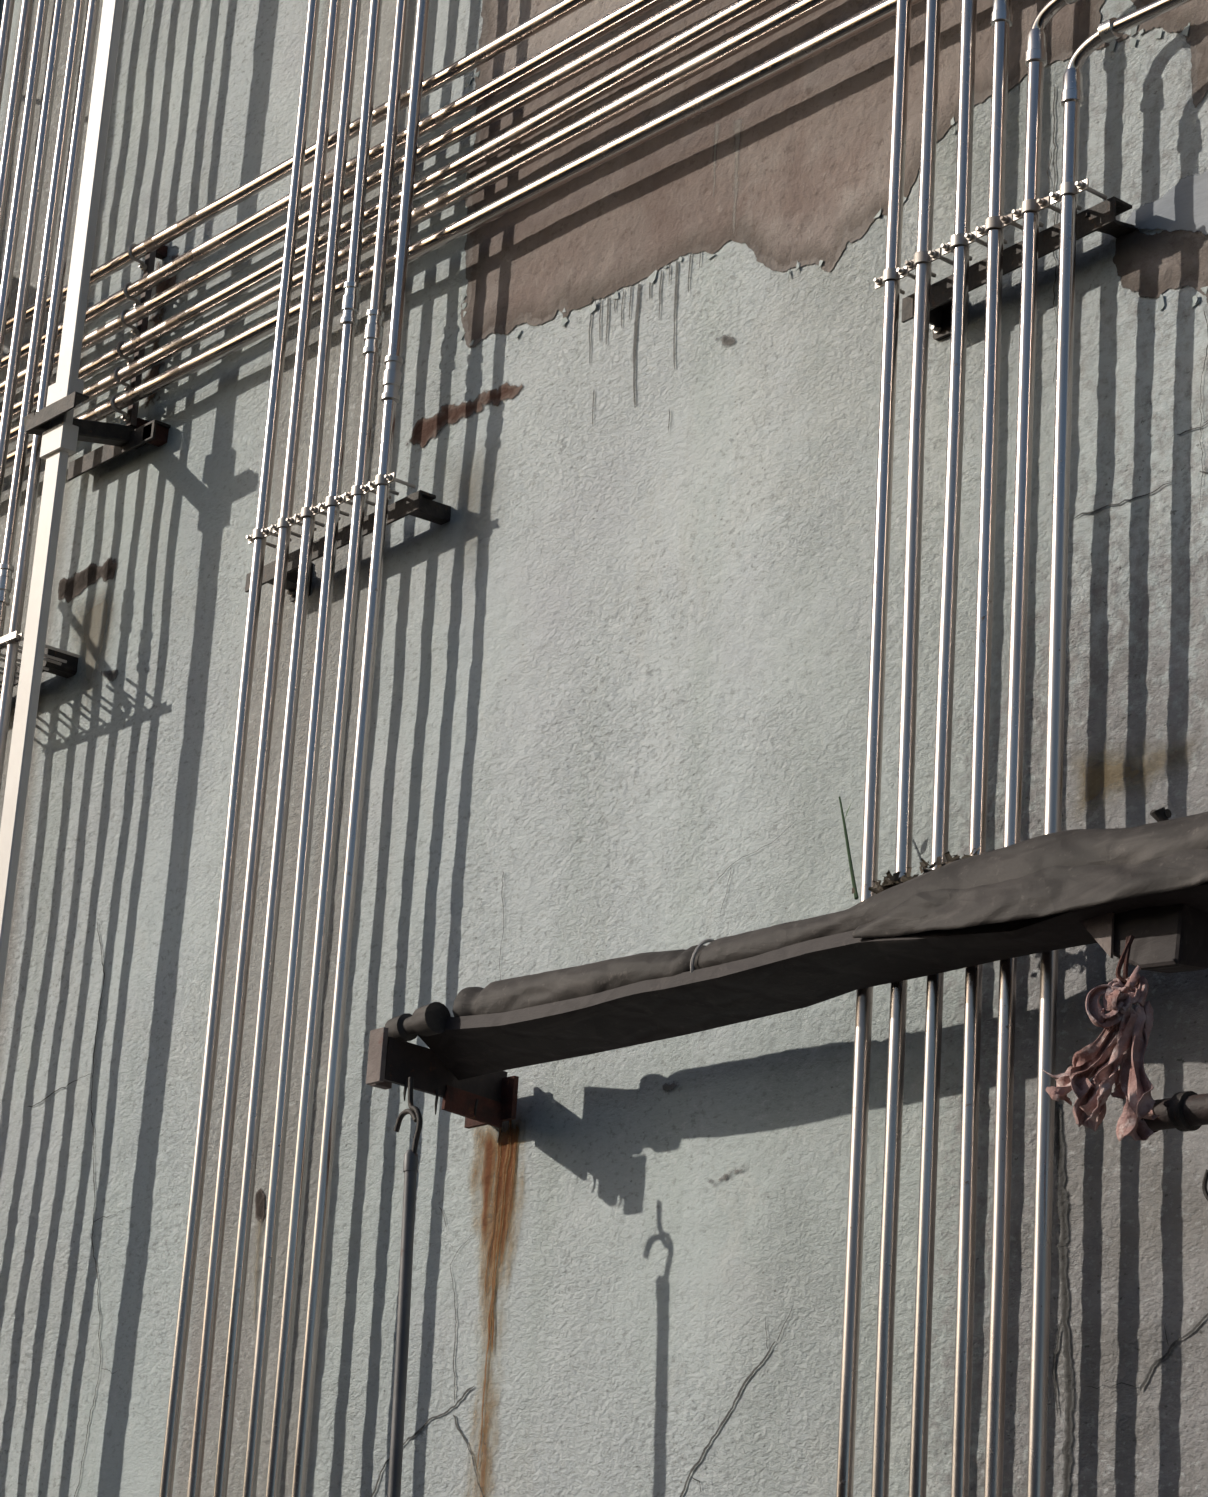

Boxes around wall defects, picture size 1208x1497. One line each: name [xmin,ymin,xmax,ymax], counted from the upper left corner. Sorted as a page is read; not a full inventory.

damp [589,252,701,406]
peeling [458,0,1208,348]
crack [28,922,132,1497]
crack [371,1207,484,1497]
rust [472,1120,519,1497]
crack [680,1306,793,1497]
crack [1052,1101,1208,1497]